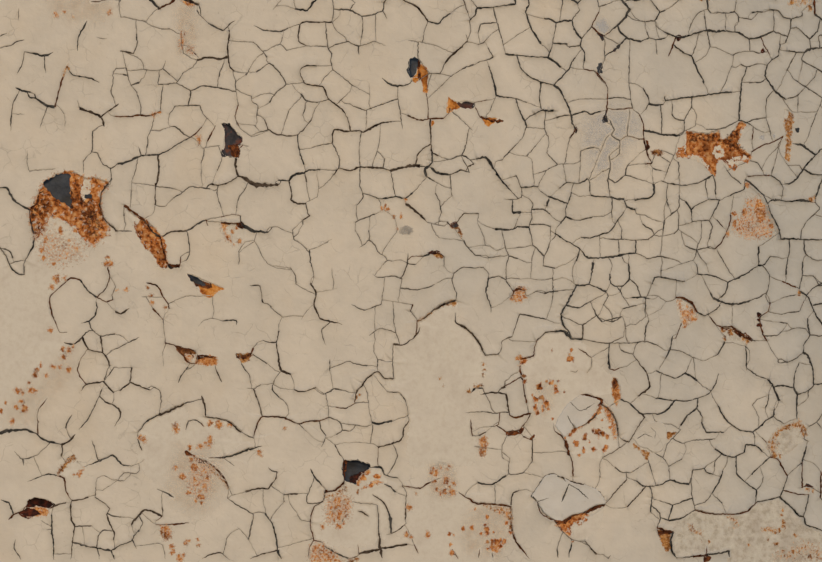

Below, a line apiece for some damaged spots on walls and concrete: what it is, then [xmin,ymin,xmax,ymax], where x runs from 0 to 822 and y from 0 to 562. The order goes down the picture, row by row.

peeling [221,123,243,158]
rust [725,182,778,242]
peeling [0,169,113,429]
crack [287,230,473,409]
peeling [18,497,55,519]
crack [0,400,185,560]
rust [171,419,235,506]
crack [49,267,431,559]
rust [305,541,360,562]
rust [320,484,354,531]
peeling [313,459,394,548]
crack [460,366,584,516]